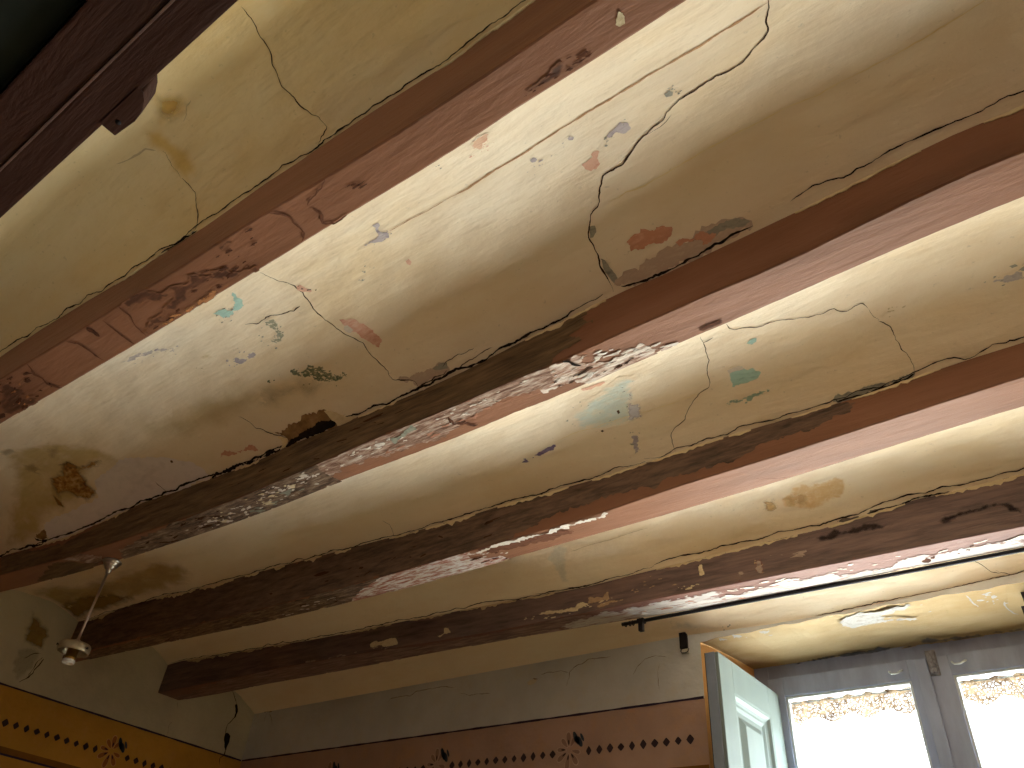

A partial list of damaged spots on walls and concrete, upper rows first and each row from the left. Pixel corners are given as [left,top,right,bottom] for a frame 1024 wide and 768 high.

water stain [132,102,200,186]
crack [791,90,1024,214]
peeling [119,241,259,364]
crack [0,0,774,557]
flaking render [614,217,753,287]
water stain [0,439,123,555]
peeling [119,342,679,559]
crack [84,303,1024,622]
water stain [765,475,848,511]
peeling [174,535,1024,699]
crack [218,691,238,765]